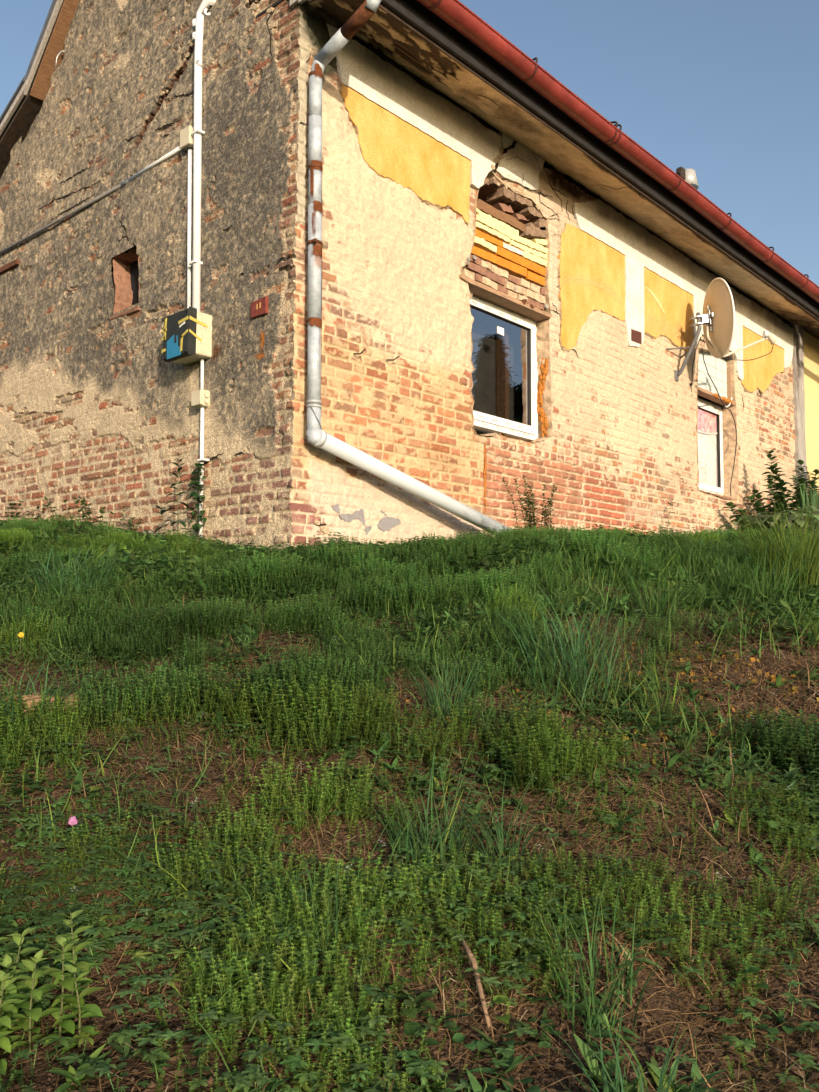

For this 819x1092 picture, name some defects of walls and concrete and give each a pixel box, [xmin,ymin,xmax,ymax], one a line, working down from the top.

crack [124,31,195,151]
flaking render [339,82,546,240]
spalling [551,166,602,199]
flaking render [557,221,625,352]
flaking render [644,267,693,352]
flaking render [741,326,784,394]
spalling [12,390,85,434]
peeling [331,504,401,535]